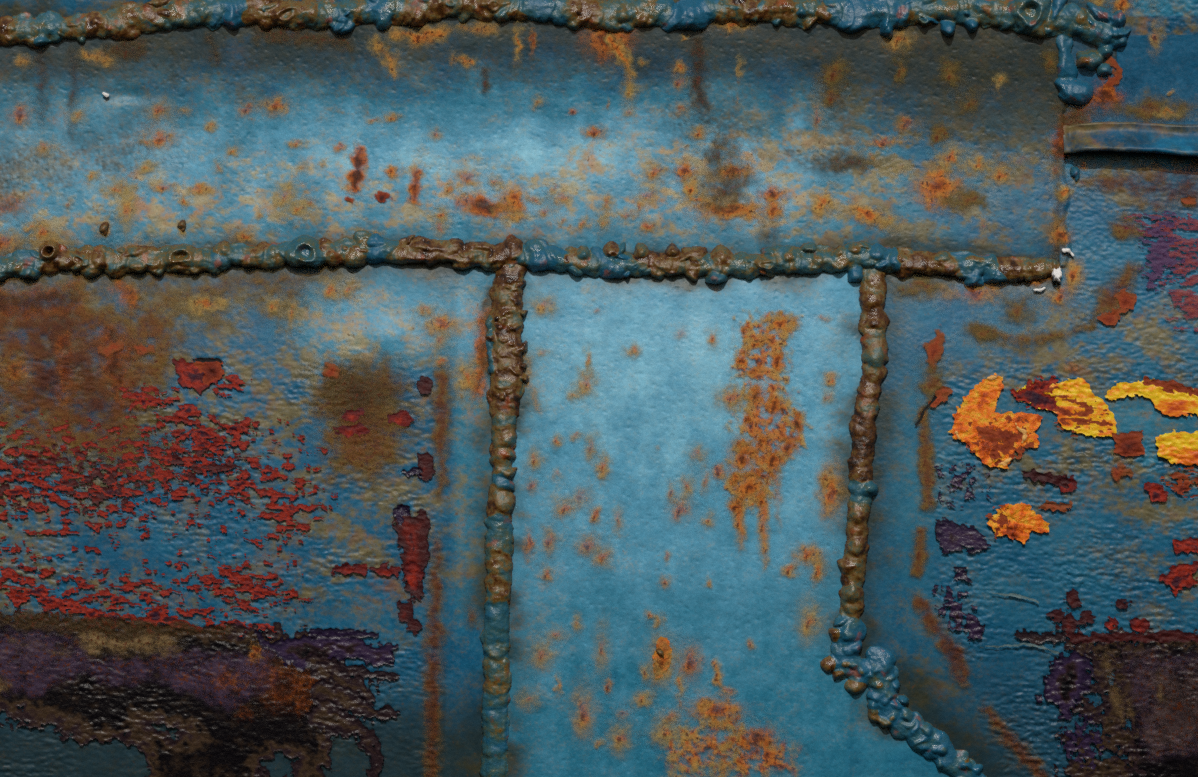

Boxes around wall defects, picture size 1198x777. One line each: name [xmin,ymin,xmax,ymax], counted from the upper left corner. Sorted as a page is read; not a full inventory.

rust [334,142,392,203]
rust [446,171,568,222]
rust [624,126,785,230]
rust [919,124,1007,209]
peeling [1097,197,1198,332]
peeling [401,452,436,481]
rust [669,310,812,560]
peeling [915,373,1198,644]
peeling [0,358,401,777]
peeling [325,504,431,635]
rust [635,612,696,706]
rust [653,660,794,777]